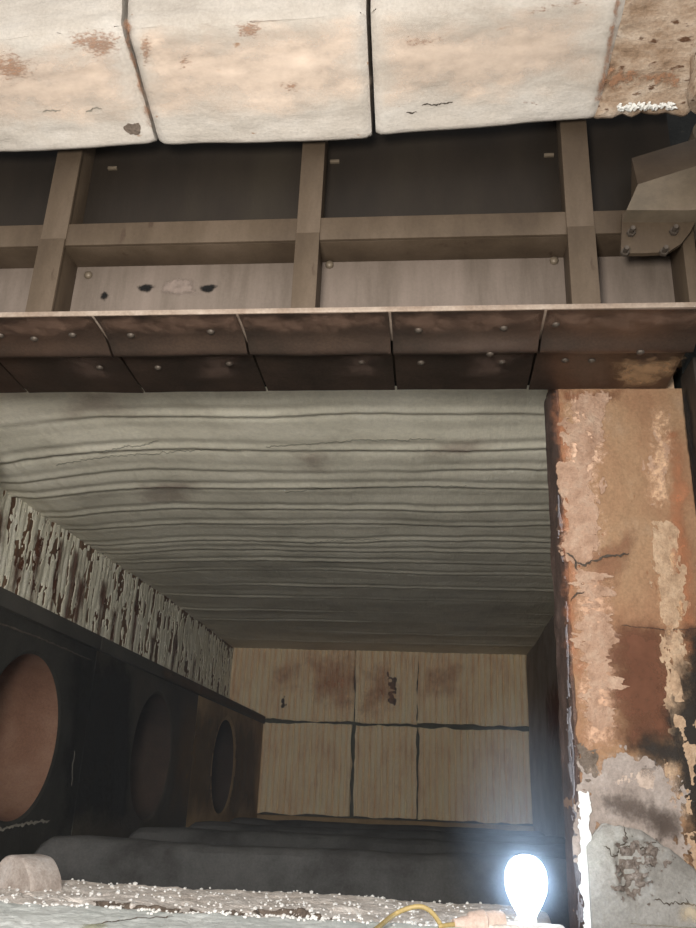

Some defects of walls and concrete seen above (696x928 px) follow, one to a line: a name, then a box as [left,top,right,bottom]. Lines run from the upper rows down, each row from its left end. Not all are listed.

corrosion [0,53,27,80]
corrosion [73,30,115,55]
crack [56,441,241,466]
crack [267,438,434,448]
corrosion [13,537,43,600]
corrosion [51,541,64,609]
corrosion [65,551,86,622]
corrosion [98,583,118,642]
peeling [0,487,233,698]
crack [567,553,629,570]
peeling [556,390,696,909]